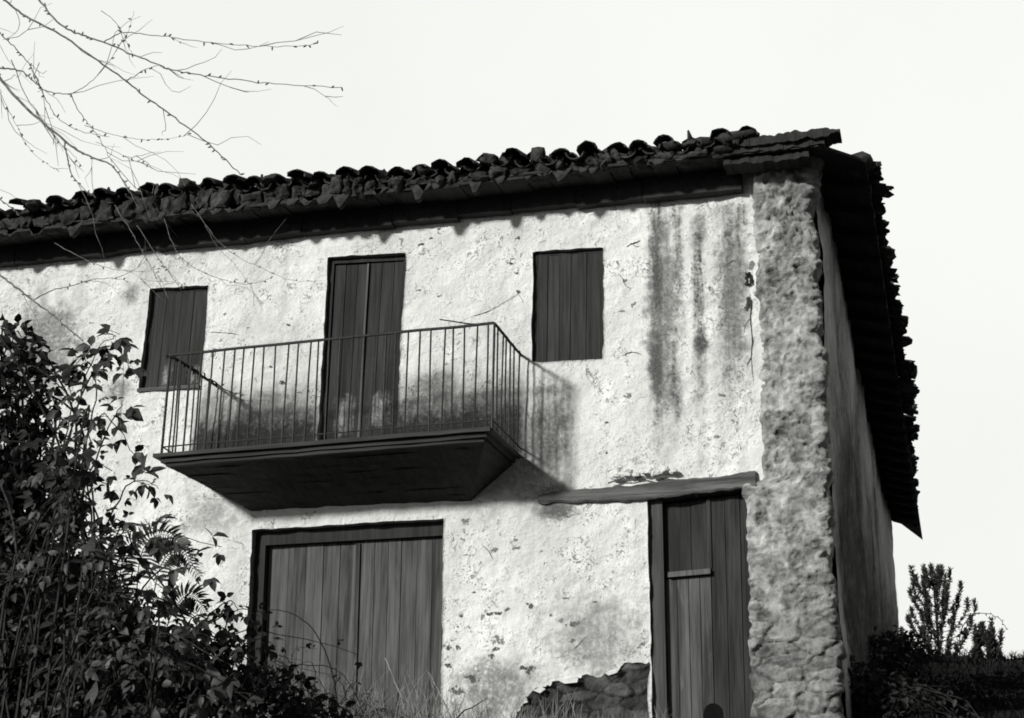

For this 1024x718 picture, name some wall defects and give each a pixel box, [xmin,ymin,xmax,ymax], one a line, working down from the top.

damp [643,202,708,416]
damp [714,207,746,376]
peeling [608,464,678,484]
spalling [518,663,650,718]